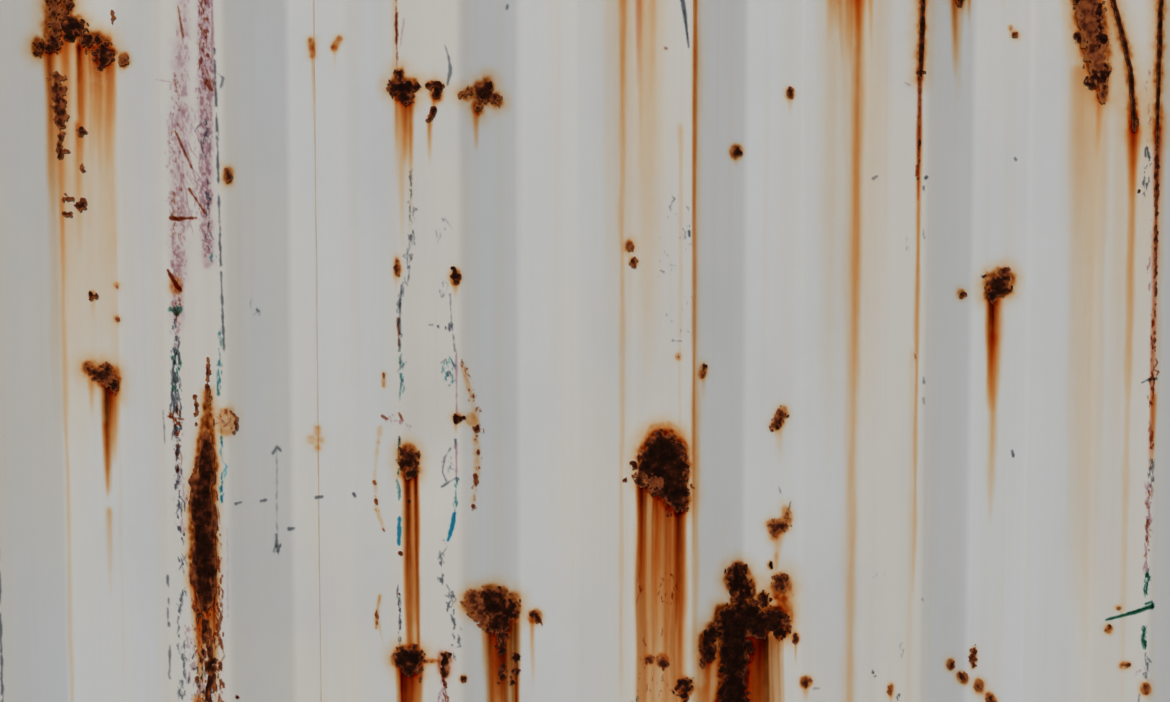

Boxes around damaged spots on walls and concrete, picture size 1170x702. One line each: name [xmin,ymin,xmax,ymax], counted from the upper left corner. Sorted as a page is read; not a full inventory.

rust [32,0,128,159]
rust [386,69,445,122]
rust [458,78,503,115]
rust [1072,0,1112,104]
rust [981,266,1015,355]
rust [83,362,121,452]
rust [186,357,239,632]
rust [398,444,420,599]
rust [622,428,695,592]
rust [460,584,542,702]
rust [672,561,799,702]
rust [947,644,997,702]